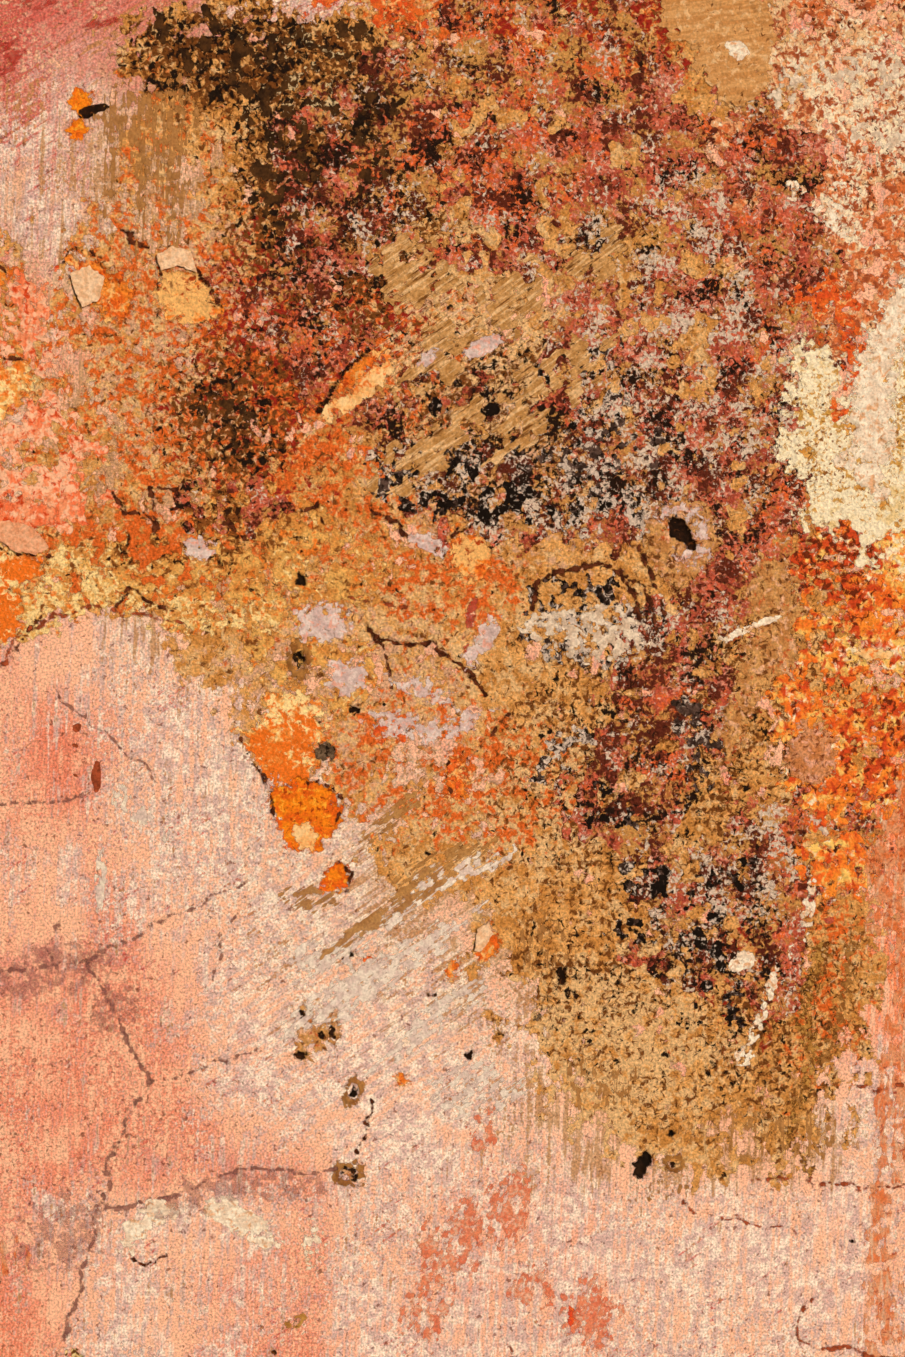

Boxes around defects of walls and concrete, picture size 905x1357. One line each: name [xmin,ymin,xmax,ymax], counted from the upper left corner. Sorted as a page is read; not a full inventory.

spalling [0,228,74,427]
corrosion [787,267,867,423]
spalling [22,471,41,486]
spalling [66,572,136,621]
corrosion [462,598,478,652]
crack [348,596,511,748]
corrosion [370,725,408,744]
corrosion [763,519,905,1357]
spalling [480,1009,509,1047]
corrosion [341,1072,365,1108]
crack [7,881,374,1356]
spalling [841,1103,861,1150]